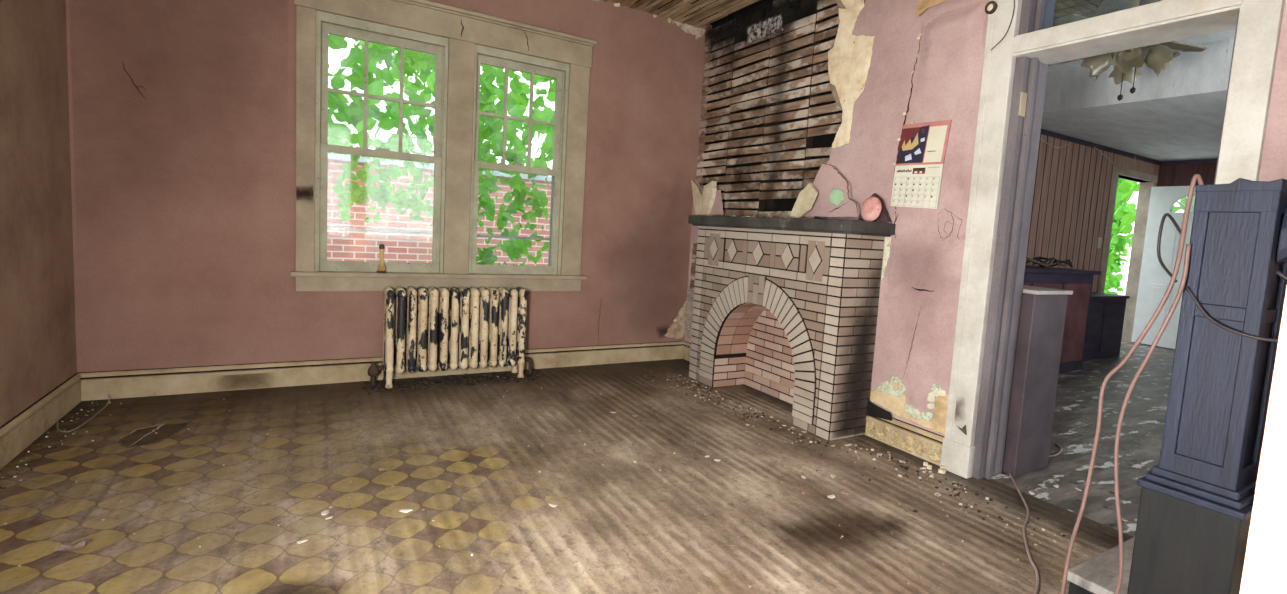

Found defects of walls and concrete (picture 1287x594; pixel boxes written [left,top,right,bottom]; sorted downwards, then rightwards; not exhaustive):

flaking render [653,0,875,218]
peeling [865,375,949,462]